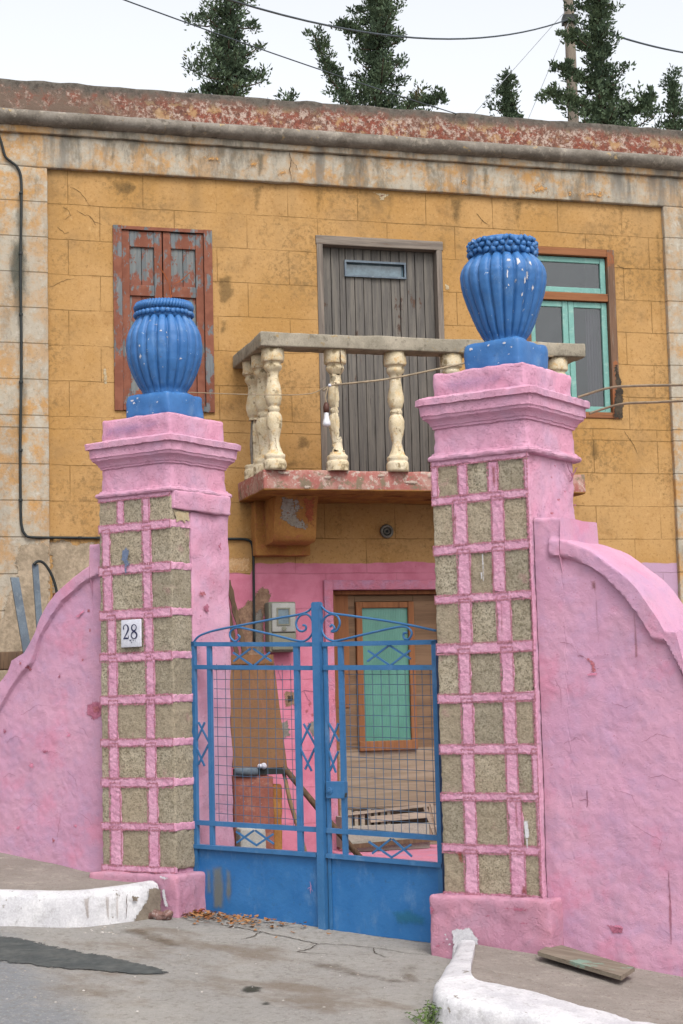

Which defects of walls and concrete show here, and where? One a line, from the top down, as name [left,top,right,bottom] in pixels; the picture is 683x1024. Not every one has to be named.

peeling [280,486,315,530]